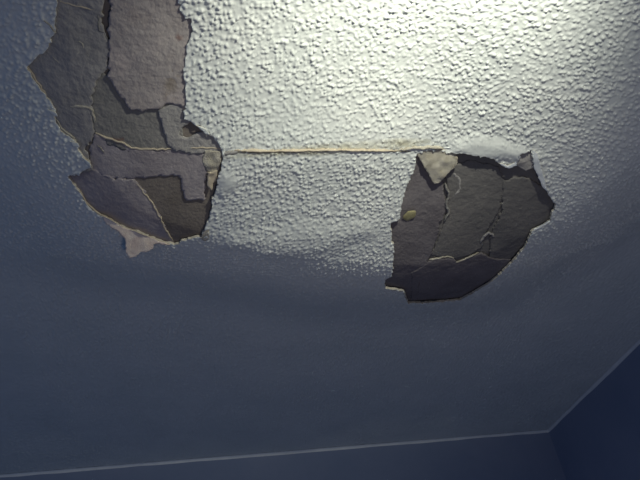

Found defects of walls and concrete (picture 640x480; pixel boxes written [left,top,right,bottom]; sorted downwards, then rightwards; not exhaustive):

peeling [27,0,223,258]
crack [224,145,450,156]
peeling [385,149,555,303]